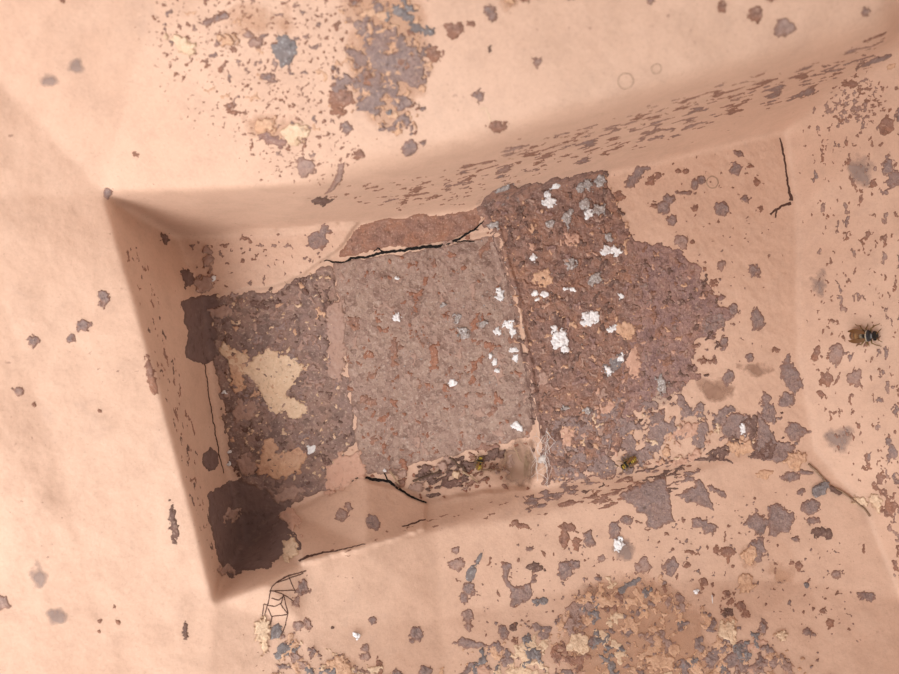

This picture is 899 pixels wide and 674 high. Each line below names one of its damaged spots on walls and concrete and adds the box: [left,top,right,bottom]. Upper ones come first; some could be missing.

peeling [254,115,310,146]
crack [770,138,793,218]
crack [324,221,541,433]
corrosion [180,32,899,674]
crack [198,303,224,473]
crack [352,473,427,527]
peeling [254,615,271,657]
peeling [326,654,357,674]
peeling [566,630,590,655]
peeling [718,619,737,645]